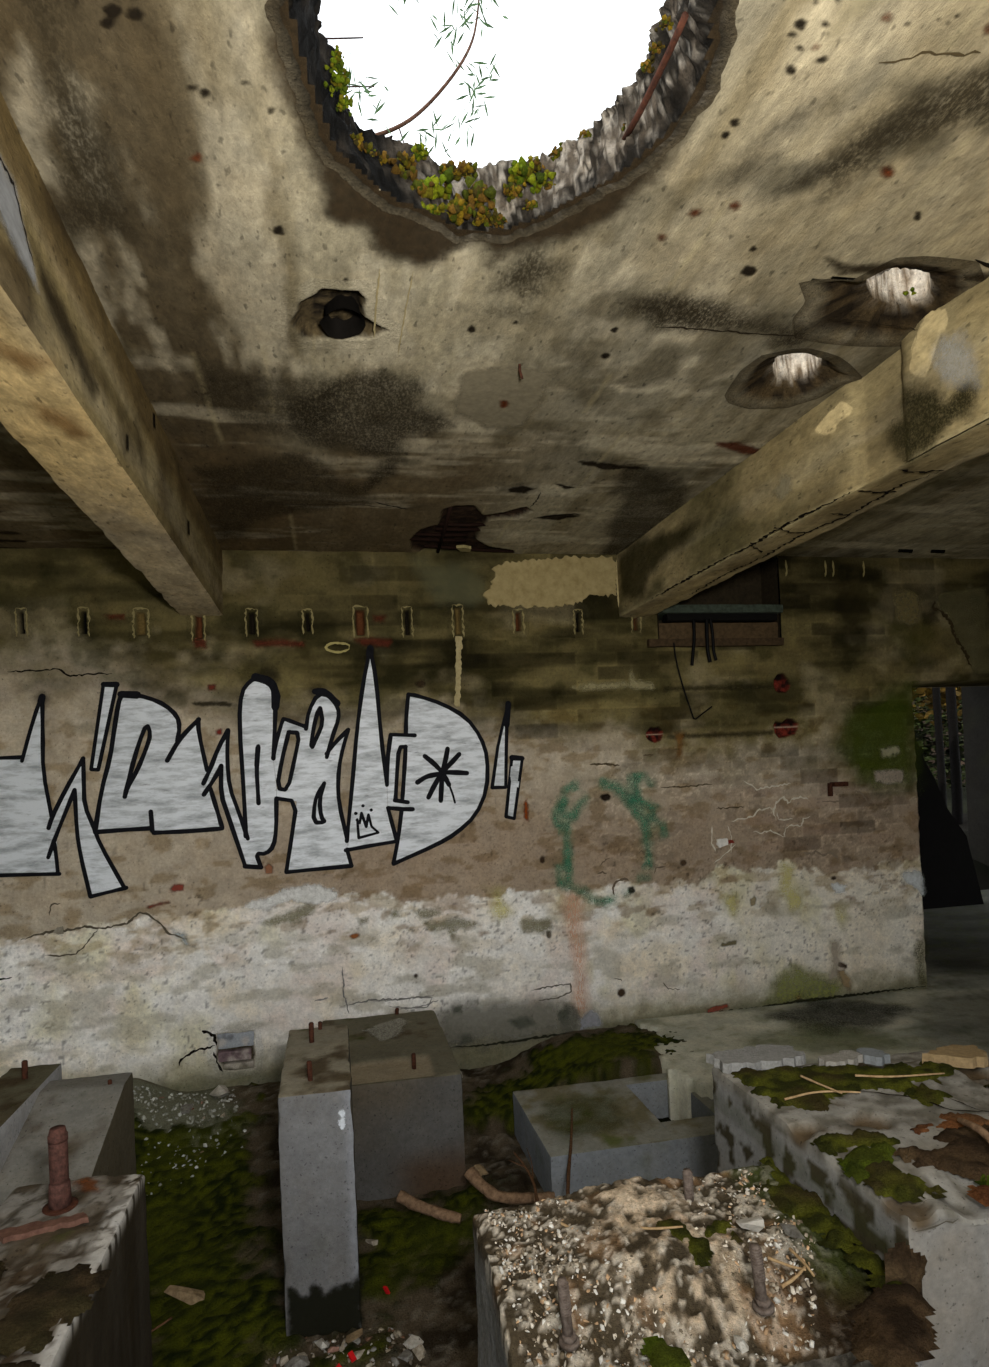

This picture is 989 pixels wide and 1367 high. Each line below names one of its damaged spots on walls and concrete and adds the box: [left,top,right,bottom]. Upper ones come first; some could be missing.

spalling [265,0,739,244]
crack [879,50,981,63]
spalling [269,278,407,350]
spalling [725,256,989,409]
damp [207,372,451,536]